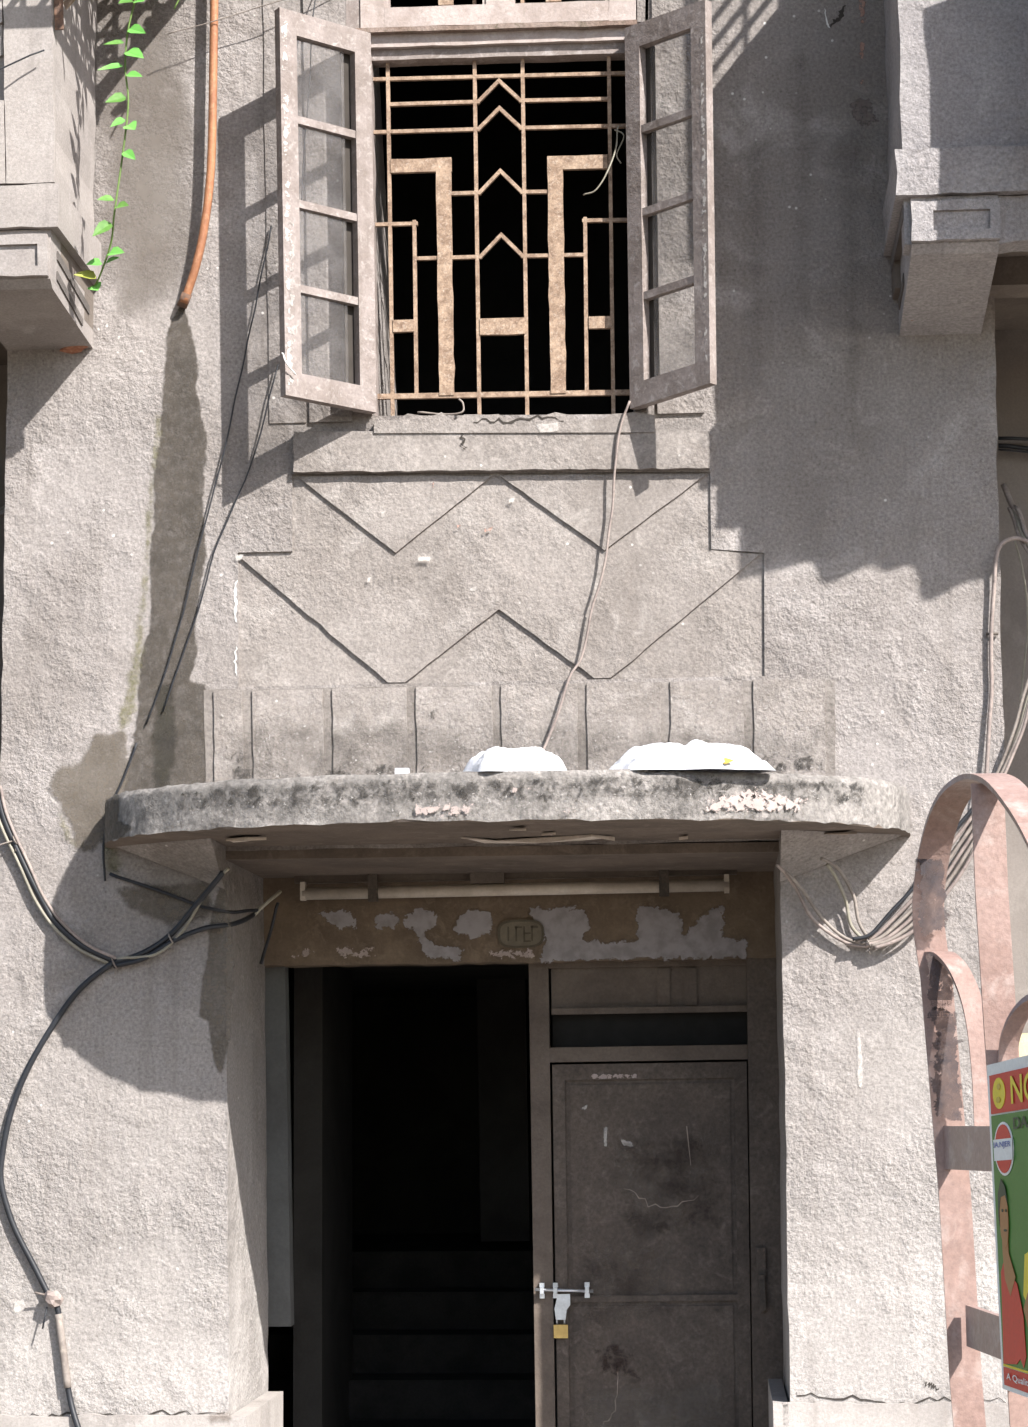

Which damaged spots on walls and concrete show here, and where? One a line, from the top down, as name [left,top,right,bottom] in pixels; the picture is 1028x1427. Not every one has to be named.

water stain [51,307,862,871]
water stain [121,883,234,1071]
peeling [318,908,374,958]
peeling [374,905,748,964]